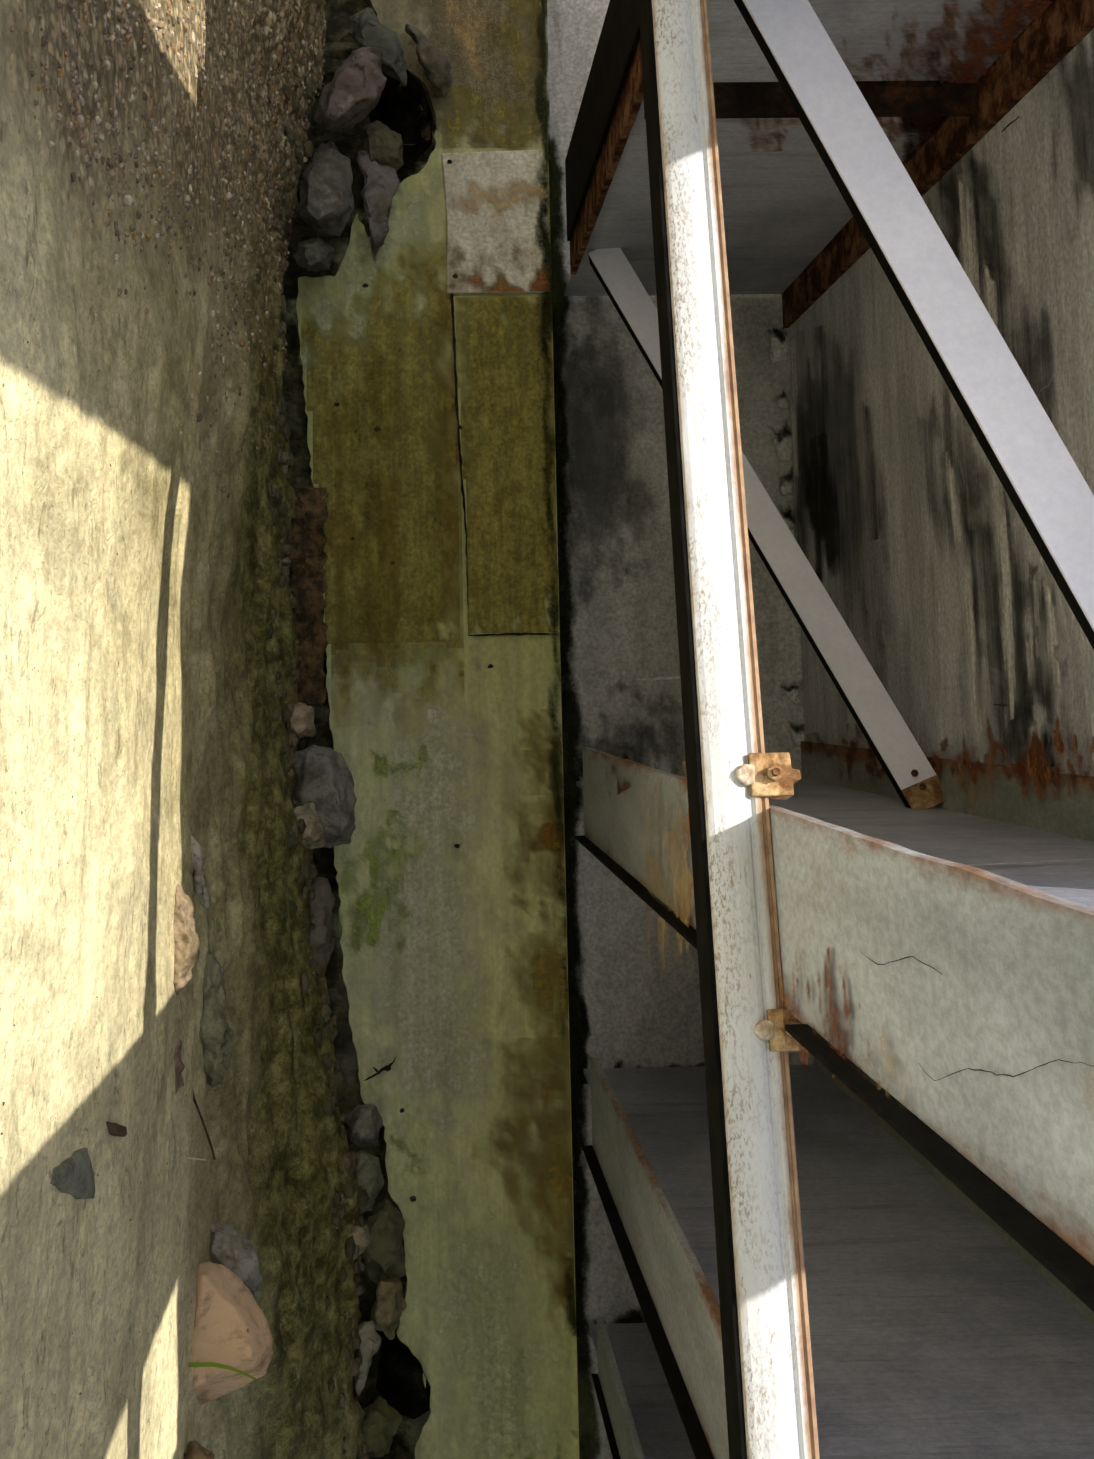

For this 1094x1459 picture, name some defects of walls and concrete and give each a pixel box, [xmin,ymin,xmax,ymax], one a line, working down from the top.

corrosion [895,0,1054,87]
corrosion [876,117,949,165]
damp [1060,27,1094,206]
corrosion [449,251,549,292]
damp [928,156,1051,417]
damp [790,326,880,618]
damp [925,398,1071,767]
corrosion [928,716,1094,801]
crack [919,1059,1091,1081]